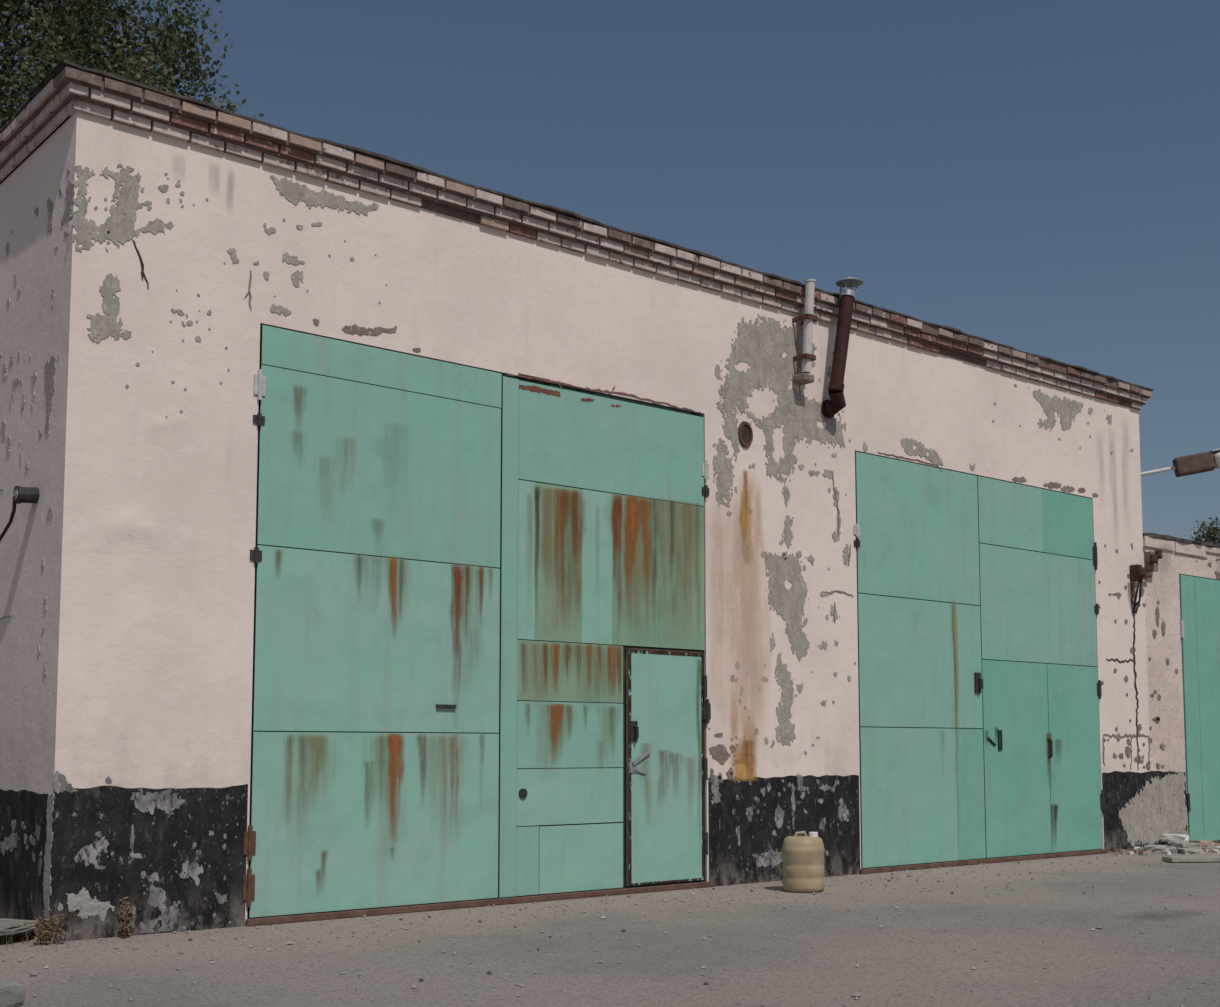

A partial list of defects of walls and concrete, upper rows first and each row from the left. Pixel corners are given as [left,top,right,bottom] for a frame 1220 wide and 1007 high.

peeling [34,164,209,252]
crack [133,240,149,289]
peeling [1014,384,1112,449]
corrosion [535,488,578,564]
corrosion [613,495,692,593]
corrosion [741,471,752,562]
peeling [713,314,868,755]
corrosion [453,564,484,652]
corrosion [389,733,403,815]
peeling [708,728,849,868]
peeling [1104,716,1190,848]
peeling [0,771,194,933]